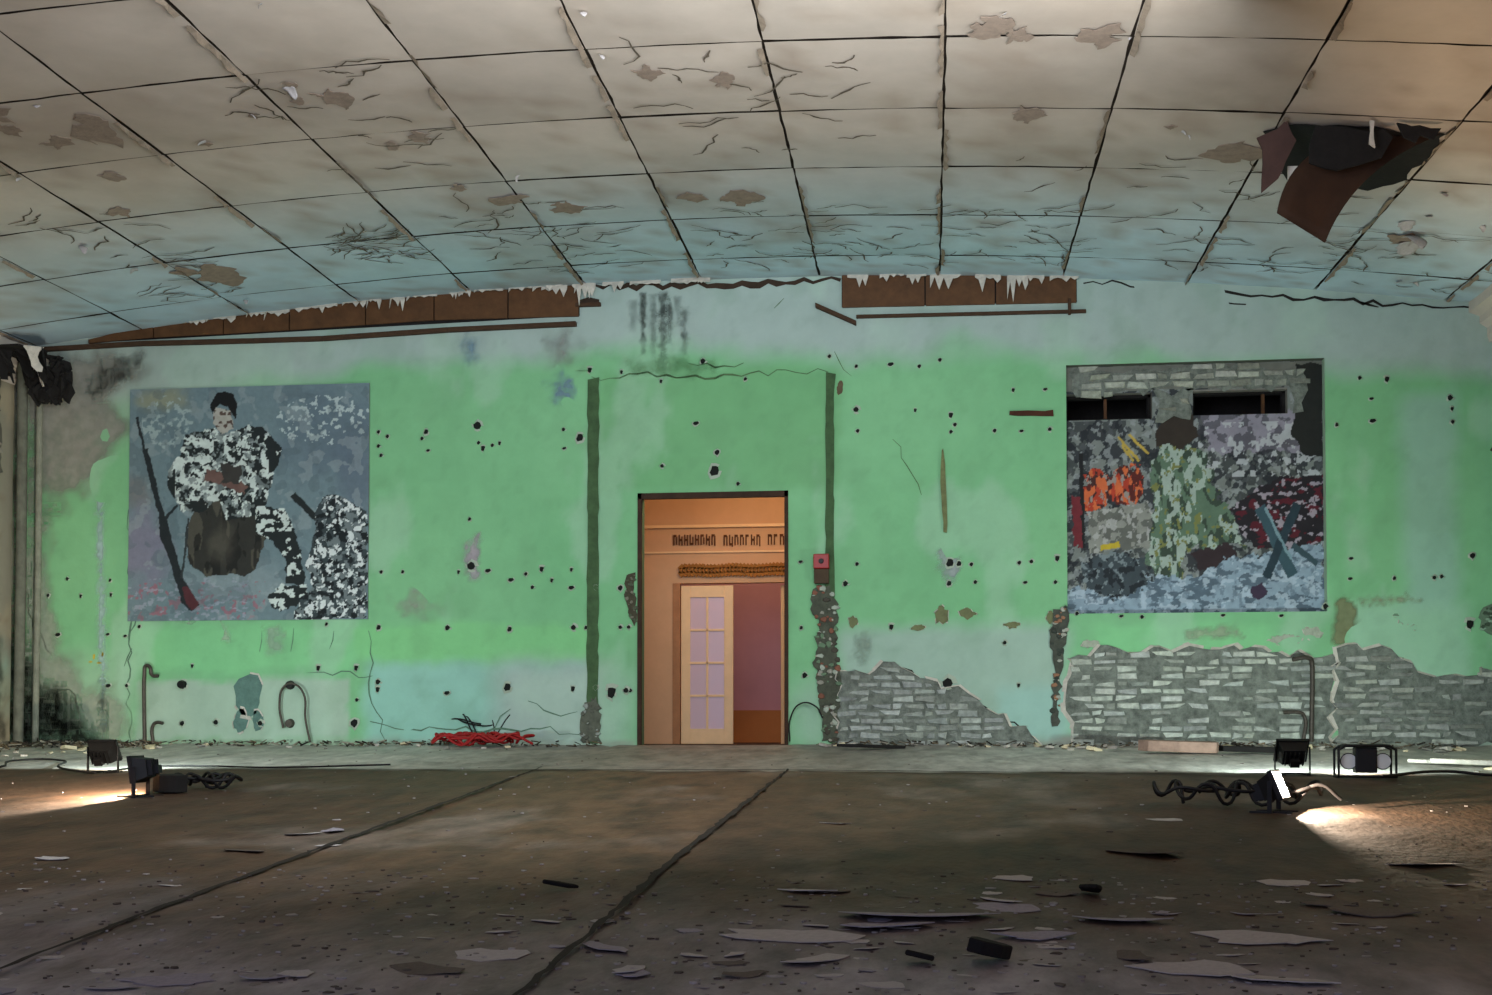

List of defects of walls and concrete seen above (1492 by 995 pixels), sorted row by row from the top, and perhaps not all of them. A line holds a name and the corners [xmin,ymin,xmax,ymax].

crack [619,37,876,155]
crack [225,59,1492,309]
water stain [0,354,143,744]
spalling [799,557,1042,745]
spalling [1045,604,1492,747]
crack [0,621,789,995]
crack [1154,769,1263,777]